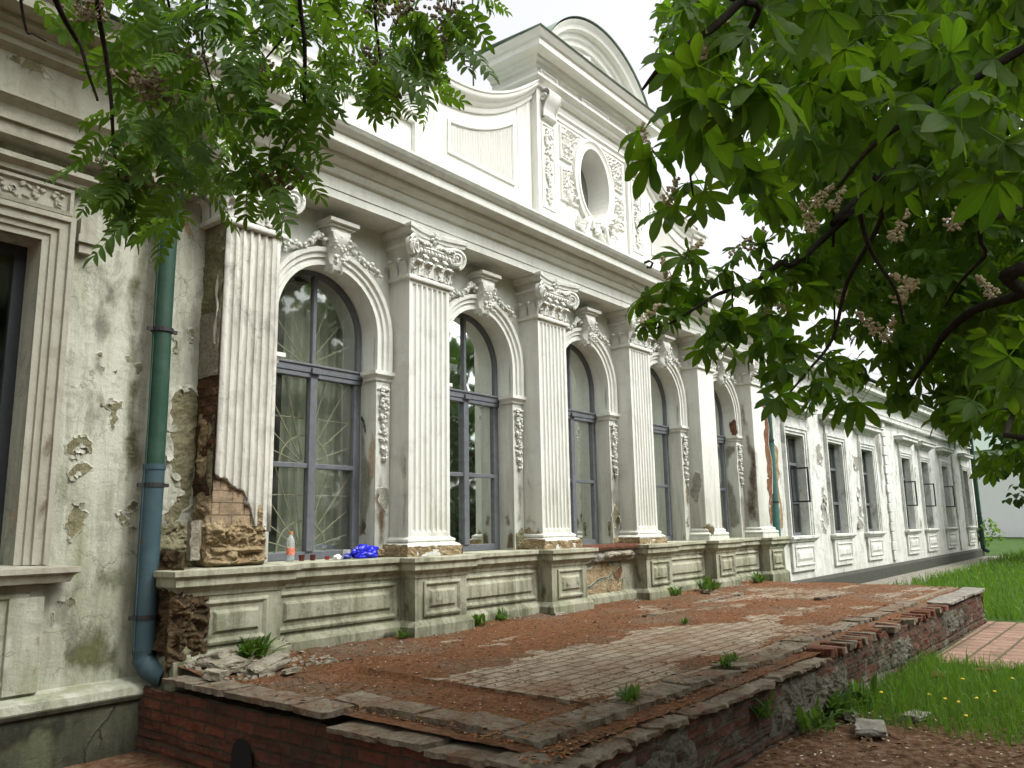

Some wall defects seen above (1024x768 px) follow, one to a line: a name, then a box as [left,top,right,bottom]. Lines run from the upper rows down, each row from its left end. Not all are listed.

peeling [100,398,124,432]
peeling [63,499,90,543]
peeling [64,433,95,483]
peeling [115,499,140,533]
spalling [157,375,267,571]
peeling [683,461,715,536]
peeling [728,418,746,533]
flaking render [587,561,623,595]
spalling [152,587,210,678]